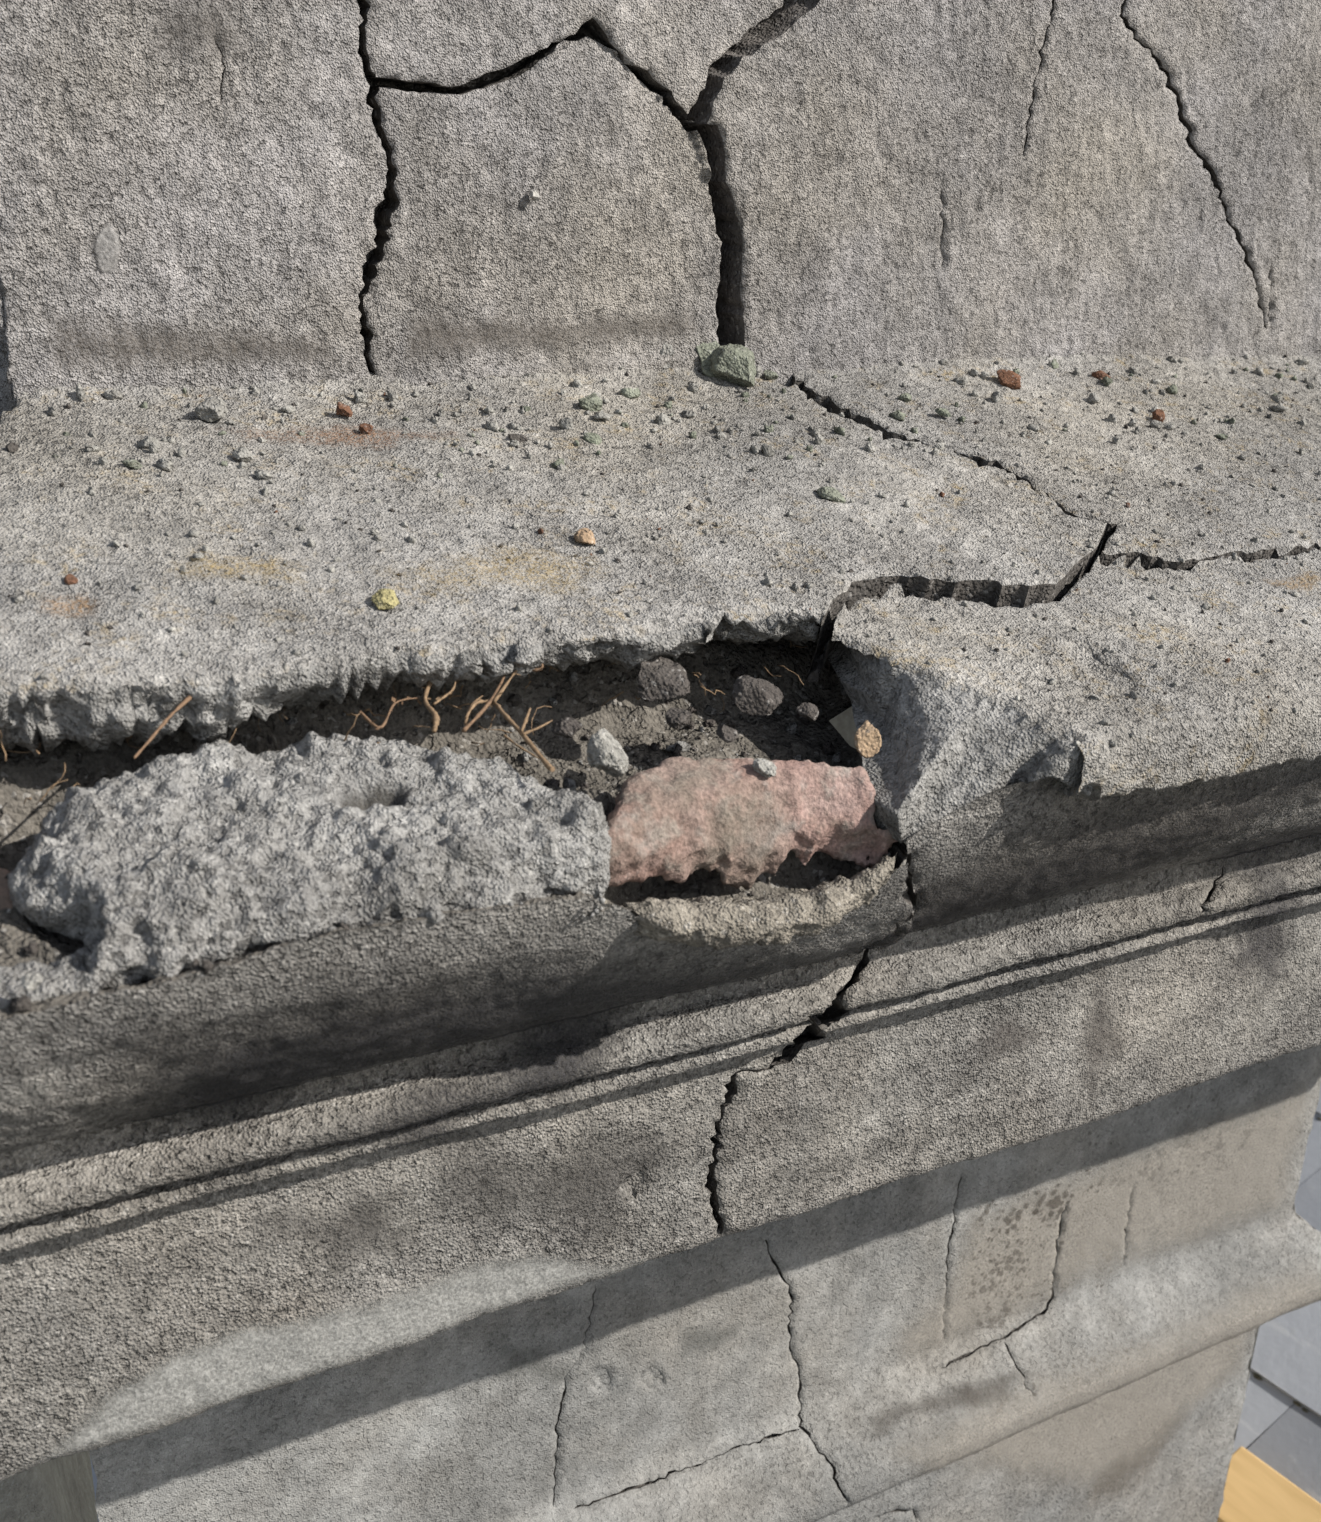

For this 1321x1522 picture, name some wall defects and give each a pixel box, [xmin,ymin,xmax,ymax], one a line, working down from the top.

crack [214,38,226,103]
crack [356,0,820,374]
crack [1023,0,1055,156]
crack [1119,0,1272,330]
crack [781,375,1321,683]
spalling [0,611,821,758]
spalling [344,789,408,810]
damp [150,962,806,1147]
crack [704,842,917,1236]
crack [553,1240,916,1518]
crack [940,1178,1066,1395]